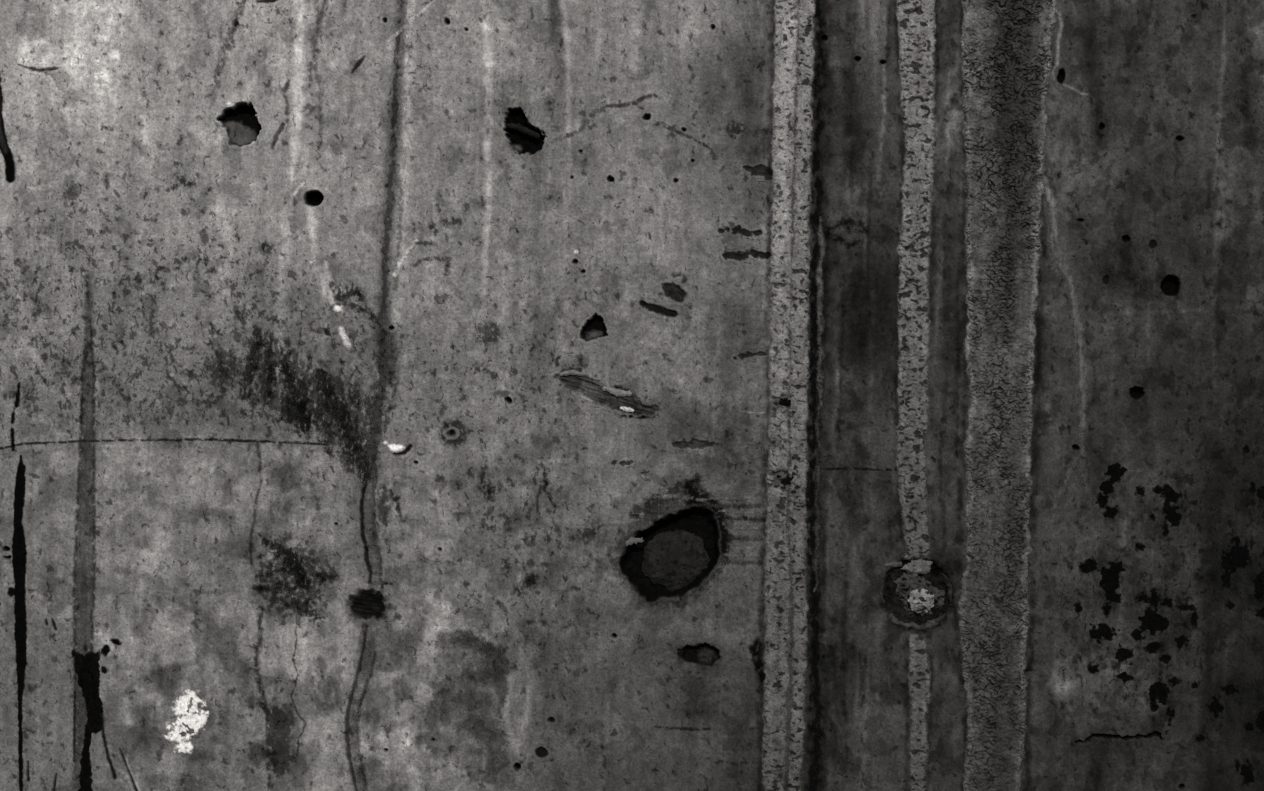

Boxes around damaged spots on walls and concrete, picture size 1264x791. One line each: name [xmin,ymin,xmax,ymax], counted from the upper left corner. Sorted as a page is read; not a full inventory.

spalling [201,83,289,154]
spalling [499,104,550,160]
spalling [575,310,611,346]
spalling [547,351,669,420]
crack [0,438,330,565]
crack [357,329,405,590]
peeling [1096,463,1127,519]
peeling [1135,484,1182,536]
spalling [675,637,724,670]
peeling [1074,558,1198,716]
crack [341,620,377,791]
crack [1071,711,1178,747]